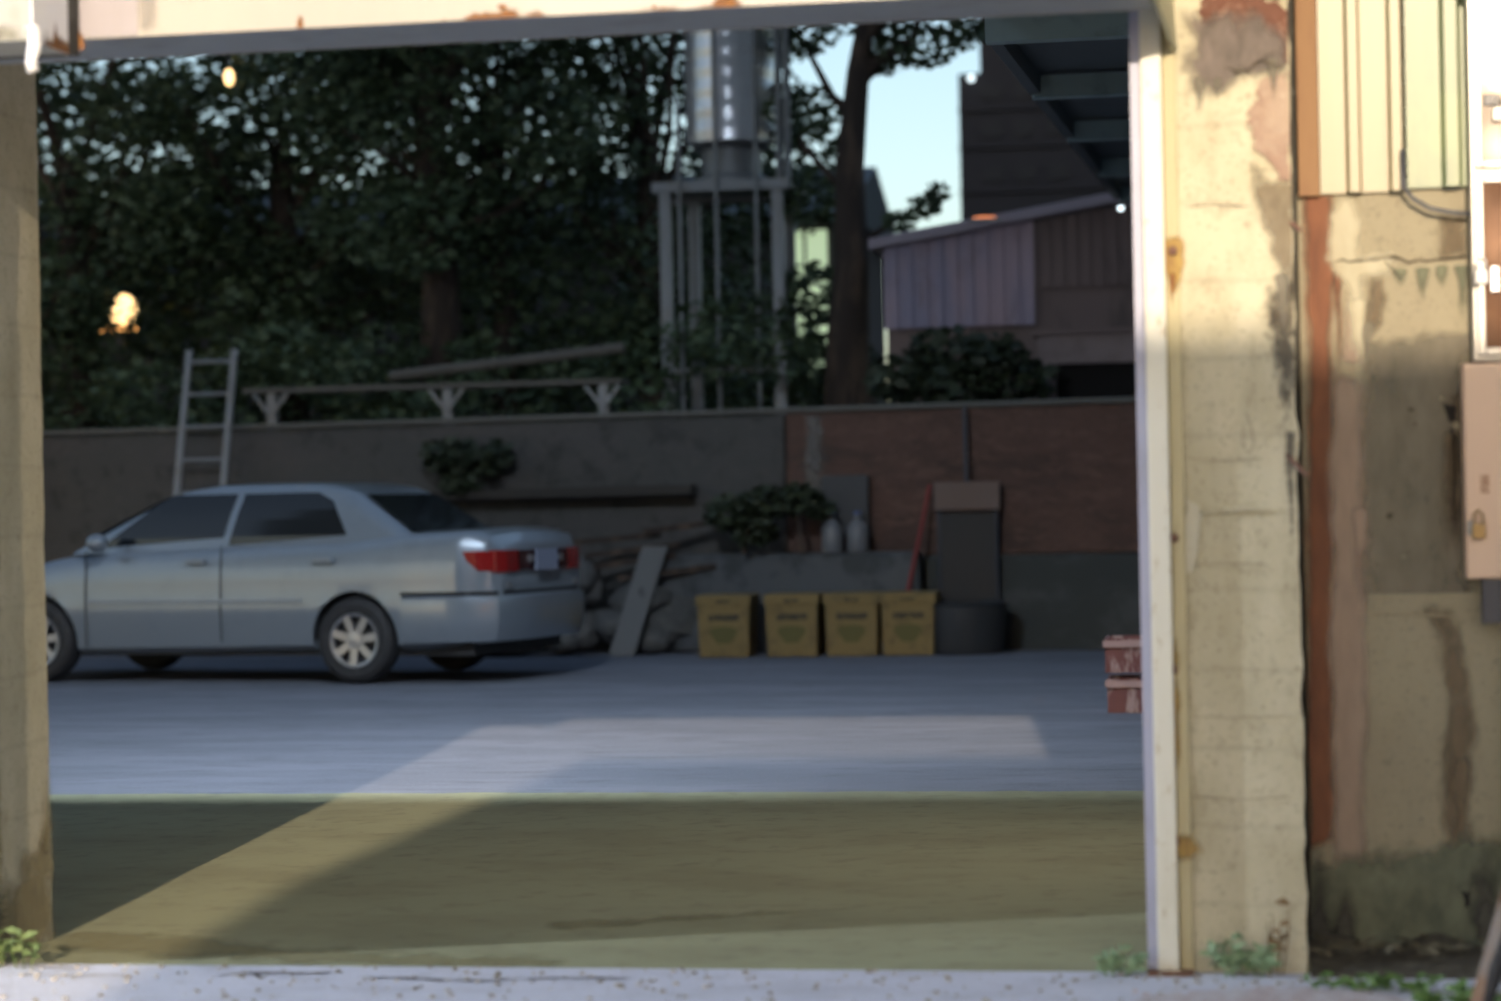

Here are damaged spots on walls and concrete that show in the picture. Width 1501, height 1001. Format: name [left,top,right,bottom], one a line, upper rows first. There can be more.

rust [44,26,85,55]
rust [464,4,544,20]
rust [704,0,741,8]
peeling [1196,0,1290,183]
rust [1304,194,1342,848]
damp [1308,198,1501,947]